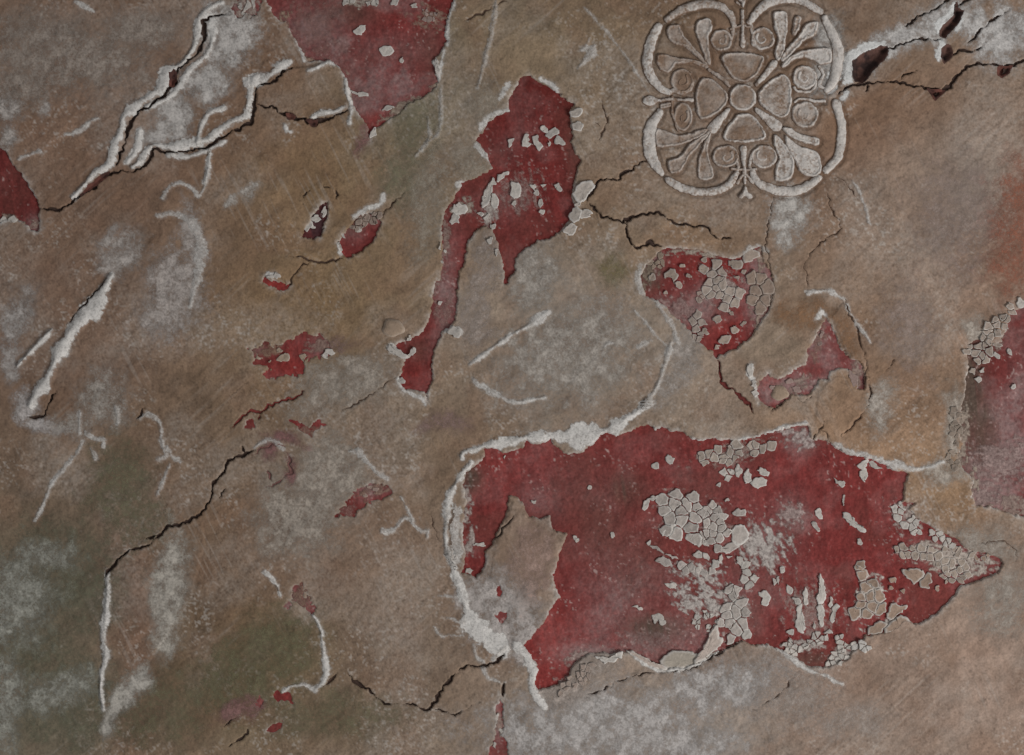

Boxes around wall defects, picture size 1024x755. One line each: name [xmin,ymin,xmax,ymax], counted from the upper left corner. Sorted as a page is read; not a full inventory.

crack [43,14,347,212]
peeling [231,0,456,138]
crack [839,0,1024,96]
peeling [0,148,40,231]
peeling [386,76,595,406]
crack [587,161,731,249]
peeling [635,245,775,358]
efflorescence [13,369,126,439]
crack [106,393,303,575]
peeling [442,297,1024,710]
leakage [455,526,553,665]
crack [323,655,505,716]